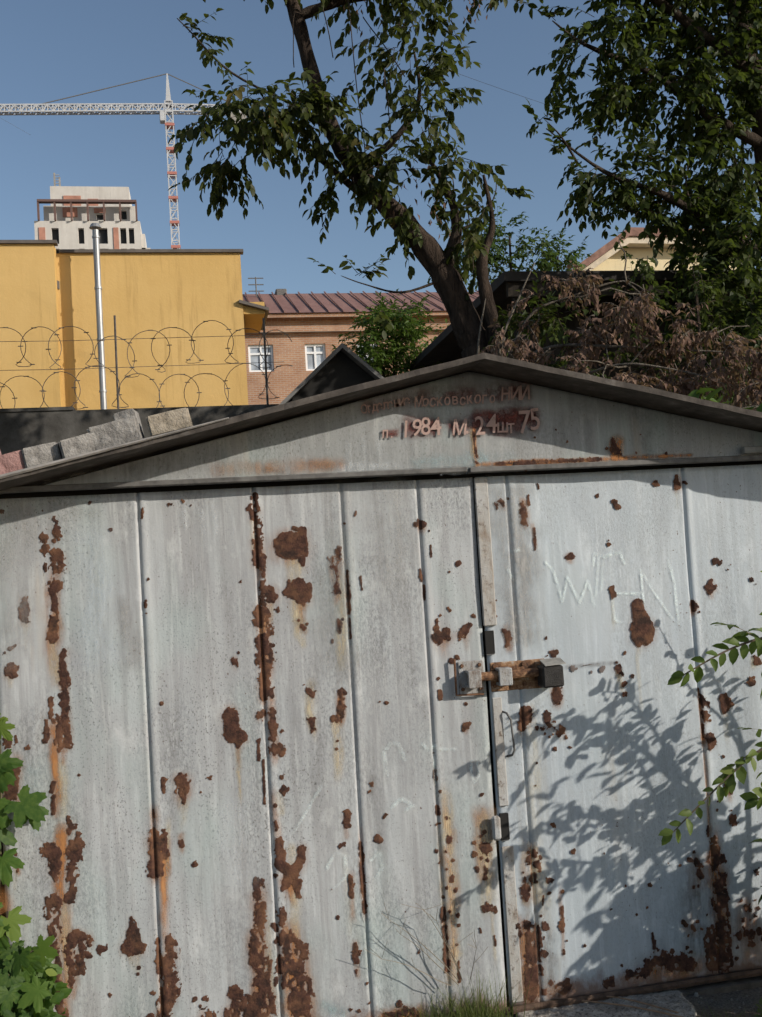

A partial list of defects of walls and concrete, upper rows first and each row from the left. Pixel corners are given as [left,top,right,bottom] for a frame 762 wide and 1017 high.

rust [222,492,313,808]
rust [431,607,476,646]
rust [615,598,655,697]
rust [39,516,108,1017]
rust [517,687,572,751]
rust [698,688,735,759]
rust [121,916,182,1017]
rust [145,809,170,918]
rust [192,820,316,1017]
rust [348,841,368,915]
rust [515,848,572,1002]
rust [602,800,762,989]